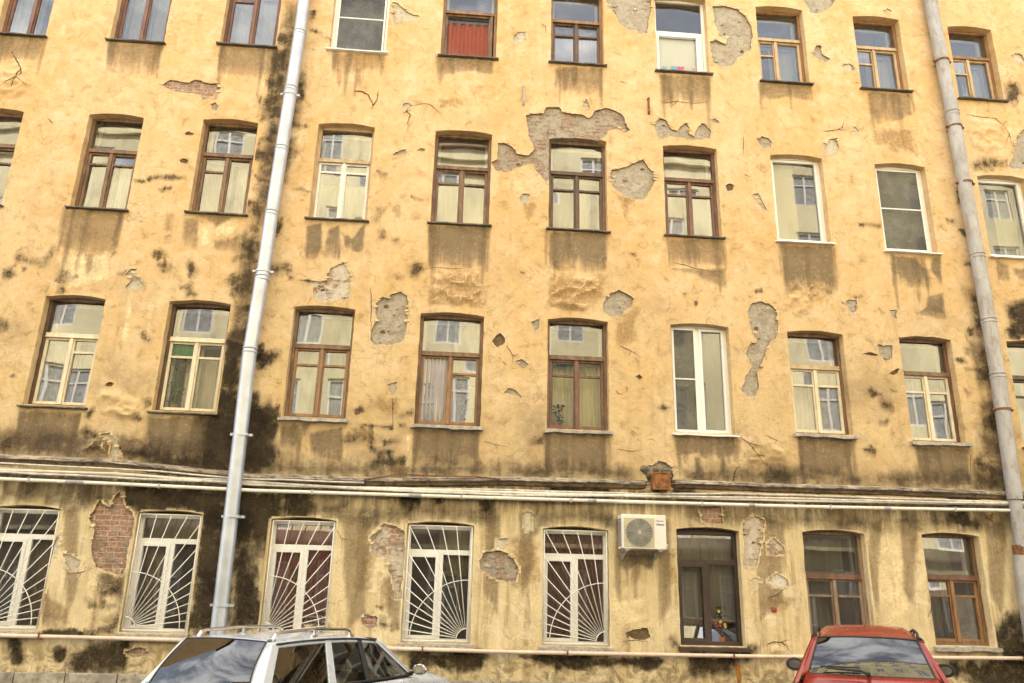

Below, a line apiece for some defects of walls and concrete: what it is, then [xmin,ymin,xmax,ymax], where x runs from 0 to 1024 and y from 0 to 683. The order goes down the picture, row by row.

crack [4,51,24,86]
spalling [709,3,755,69]
spalling [492,96,630,181]
leakage [0,10,294,635]
spalling [369,290,412,349]
spalling [741,297,780,400]
spalling [53,489,136,578]
leakage [230,392,482,633]
leakage [42,574,129,673]
leakage [408,651,488,672]
leakage [520,655,663,671]
mould [949,612,1024,683]